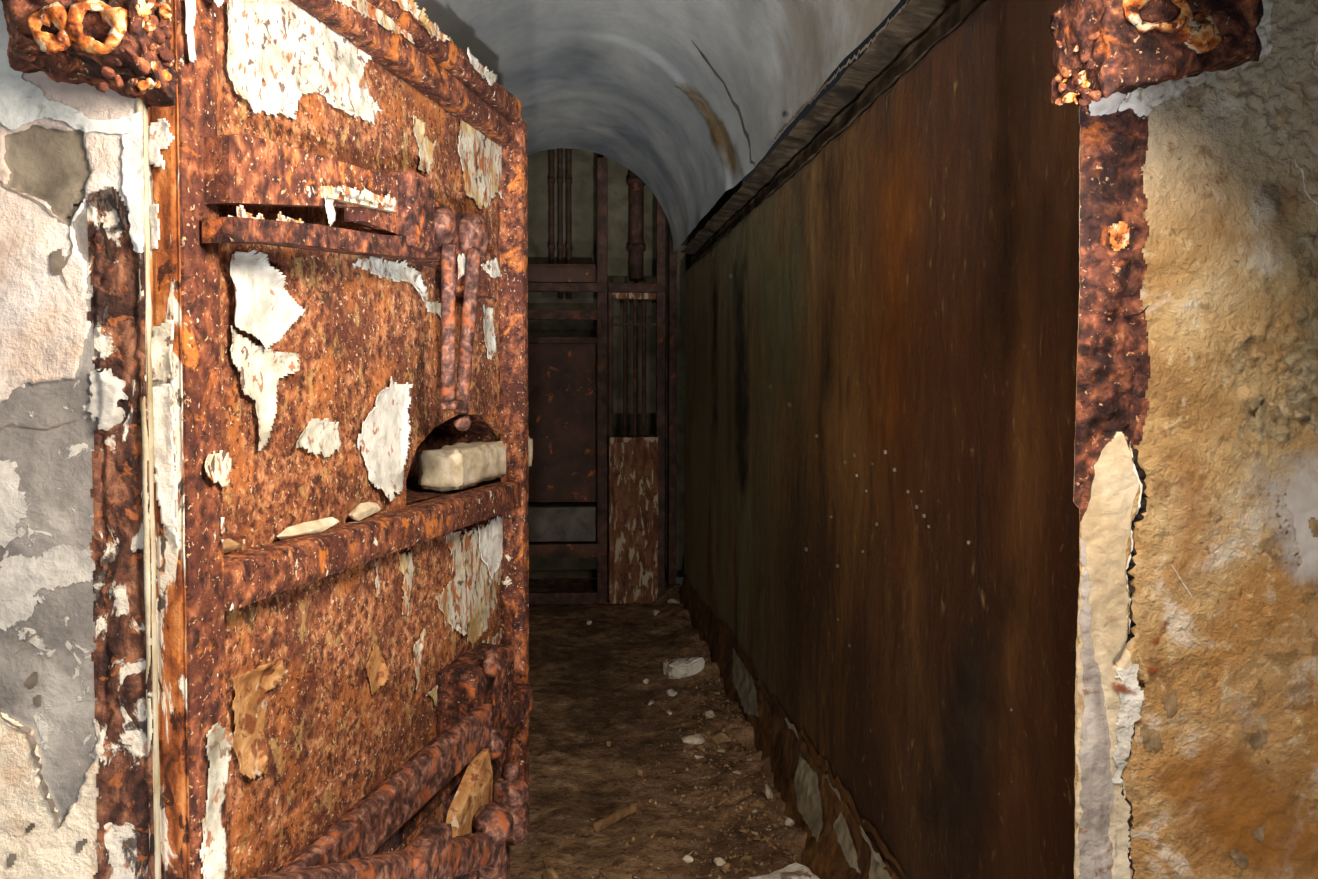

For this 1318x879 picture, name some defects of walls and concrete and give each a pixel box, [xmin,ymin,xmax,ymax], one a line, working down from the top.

peeling [185,0,197,63]
peeling [214,0,382,125]
peeling [335,0,453,44]
crack [691,0,908,171]
peeling [321,185,397,226]
peeling [458,117,502,209]
peeling [353,256,441,318]
peeling [230,250,306,451]
flaking render [0,0,179,879]
peeling [295,376,413,502]
spalling [1074,0,1276,879]
peeling [436,514,503,648]